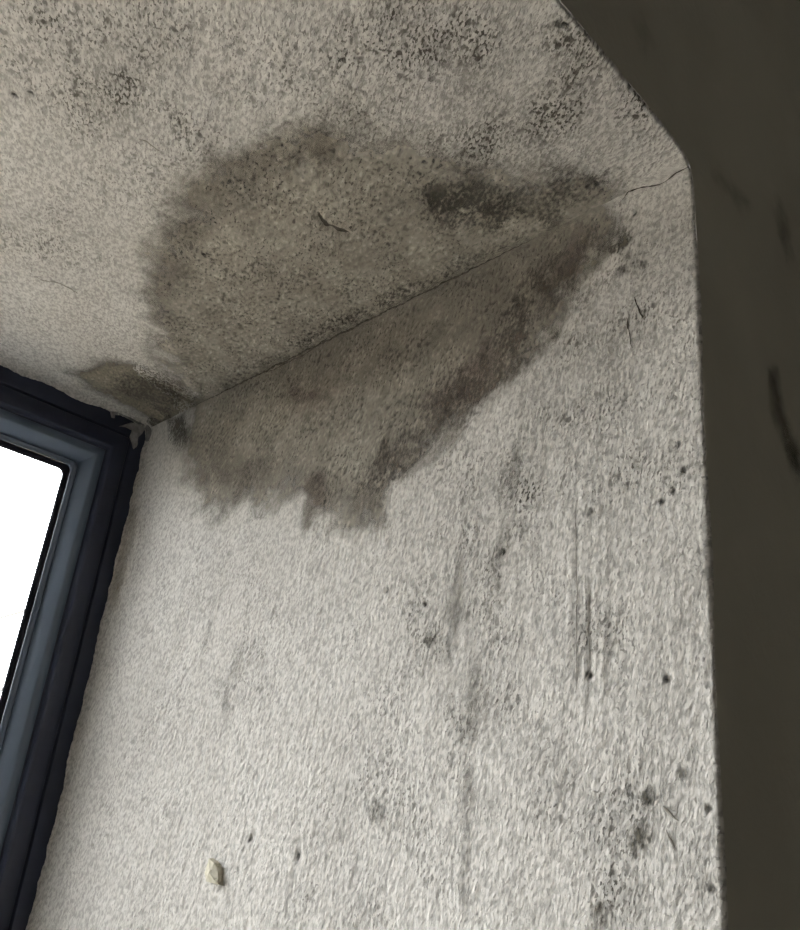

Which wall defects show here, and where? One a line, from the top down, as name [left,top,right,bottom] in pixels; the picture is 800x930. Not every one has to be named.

water stain [75,130,632,529]
crack [620,167,688,202]